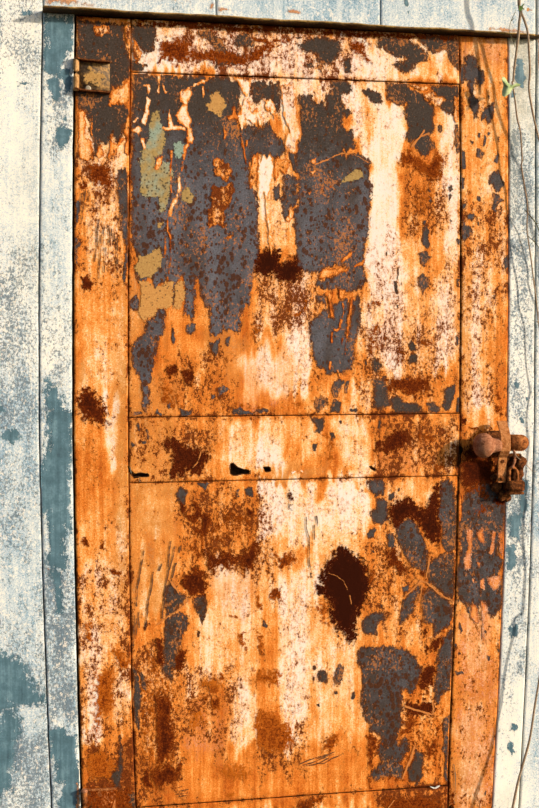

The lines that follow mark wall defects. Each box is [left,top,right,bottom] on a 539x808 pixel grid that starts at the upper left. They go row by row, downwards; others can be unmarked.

rust [134,20,457,68]
peeling [43,13,500,447]
rust [250,245,304,285]
peeling [41,377,74,616]
rust [176,501,262,602]
rust [316,541,431,647]
rust [385,458,447,549]
peeling [366,478,530,705]
peeling [0,646,47,799]
rust [76,638,224,808]
peeling [313,663,344,694]
peeling [351,644,425,787]